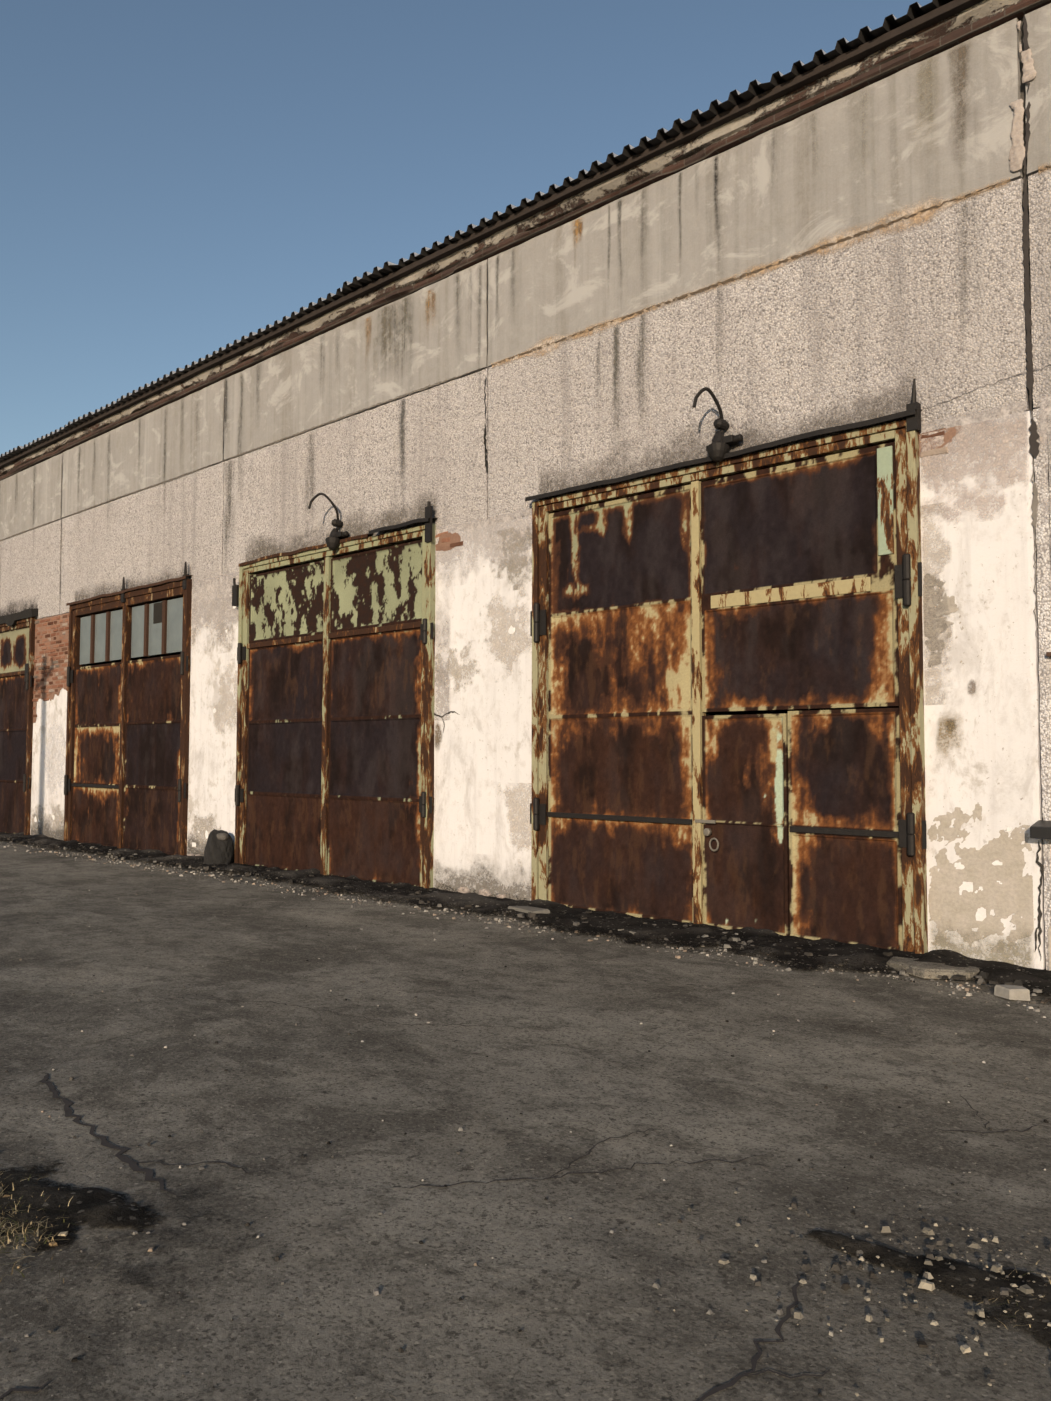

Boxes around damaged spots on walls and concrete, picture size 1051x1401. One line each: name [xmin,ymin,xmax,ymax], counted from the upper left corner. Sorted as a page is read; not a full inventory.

leakage [954,46,967,138]
leakage [381,298,411,352]
flaking render [435,531,463,551]
peeling [485,527,532,670]
flaking render [919,419,1046,705]
flaking render [32,613,69,723]
peeling [435,647,479,690]
peeling [505,783,532,848]
peeling [457,886,506,898]
crack [697,1258,832,1401]